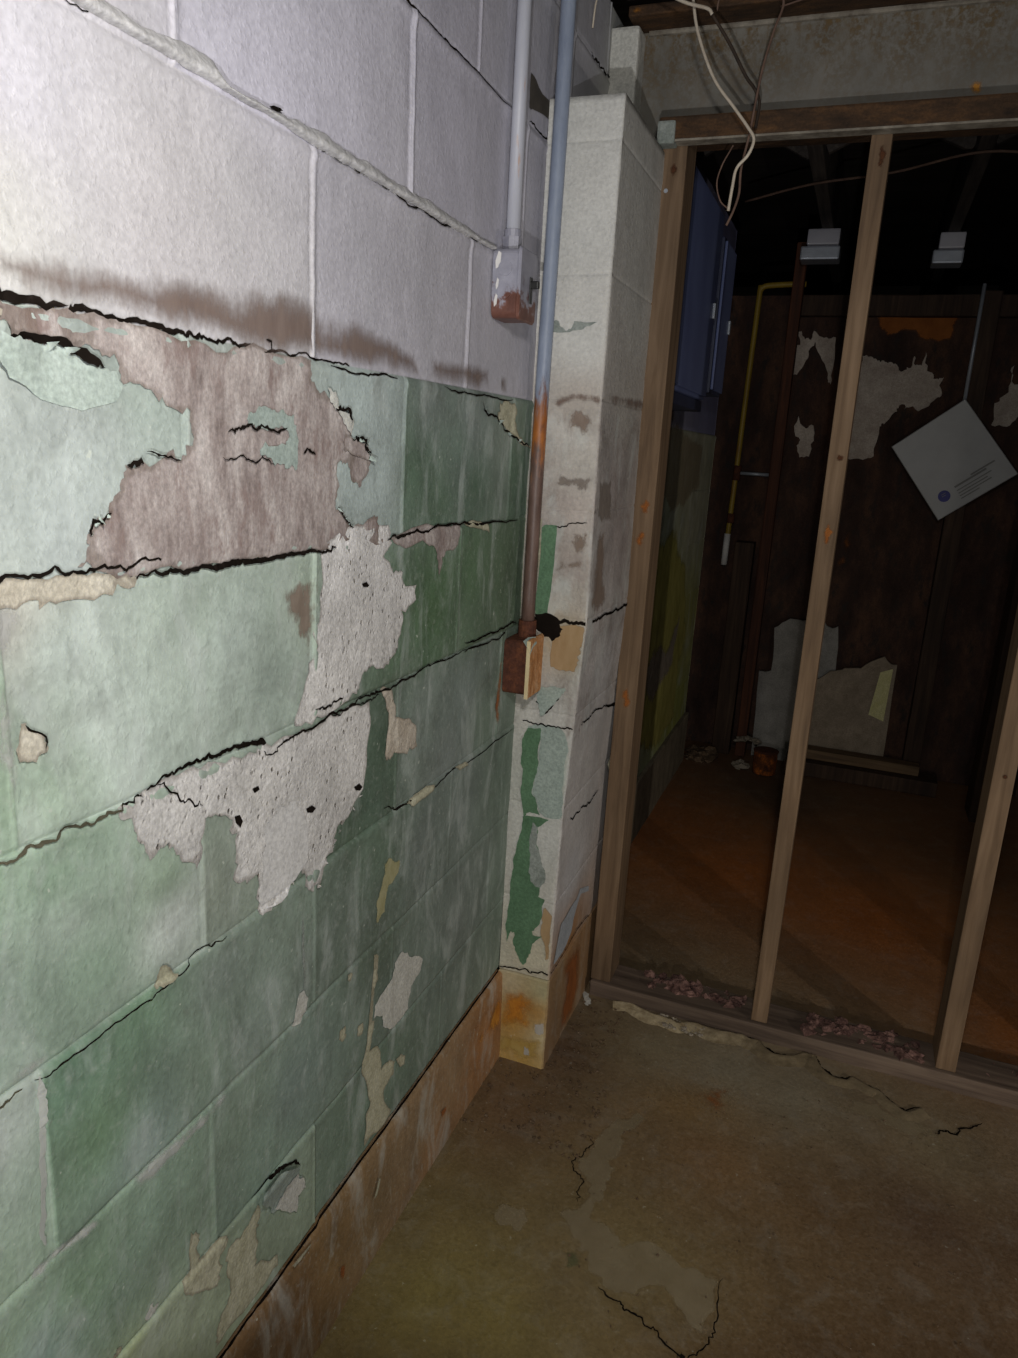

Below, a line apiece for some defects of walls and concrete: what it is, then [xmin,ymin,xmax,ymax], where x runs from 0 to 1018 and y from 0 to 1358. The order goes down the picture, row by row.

crack [0,289,398,379]
water stain [22,268,412,366]
water stain [436,366,483,385]
peeling [794,331,836,384]
peeling [848,354,943,460]
crack [0,546,337,583]
peeling [0,301,417,923]
crack [388,520,516,575]
crack [0,604,627,865]
peeling [505,686,569,965]
crack [0,936,227,1109]
peeling [339,952,423,1146]